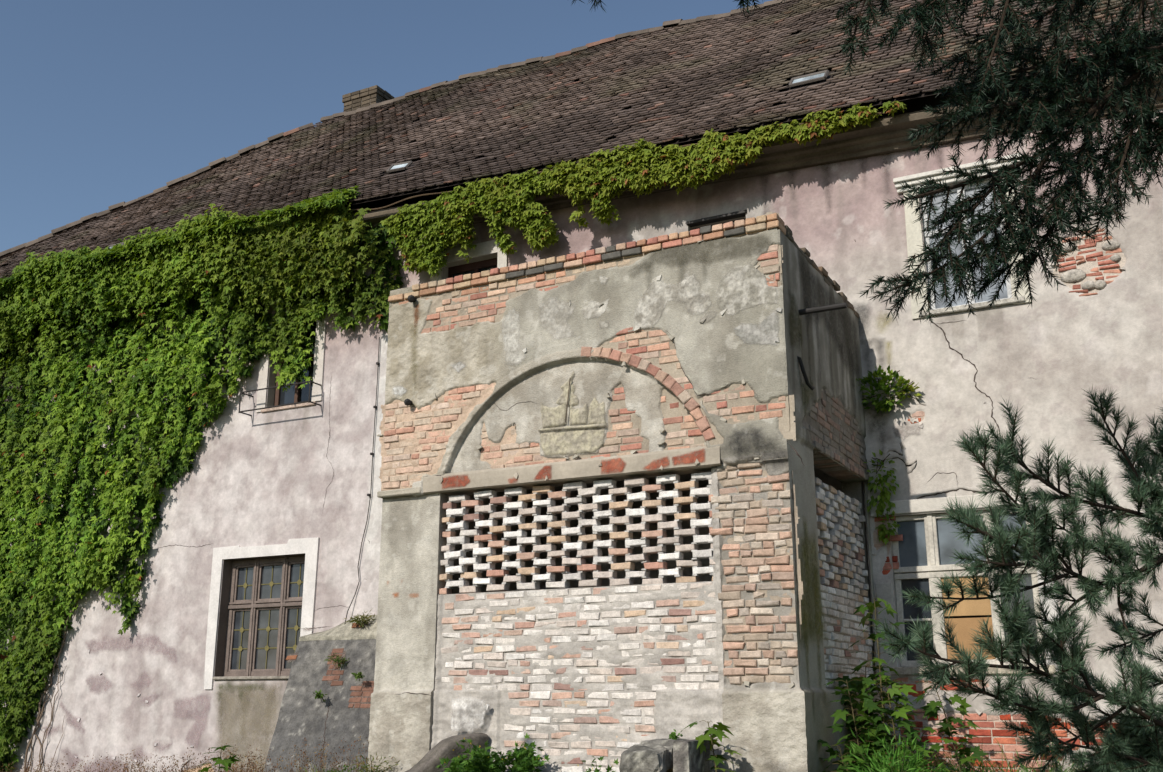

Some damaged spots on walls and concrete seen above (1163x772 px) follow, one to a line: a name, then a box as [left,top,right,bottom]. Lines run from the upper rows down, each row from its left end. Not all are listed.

spalling [690,212,780,243]
spalling [1051,225,1126,296]
spalling [392,240,796,483]
crack [931,320,1000,435]
spalling [377,383,496,491]
spalling [322,648,374,709]
spalling [876,677,1118,772]